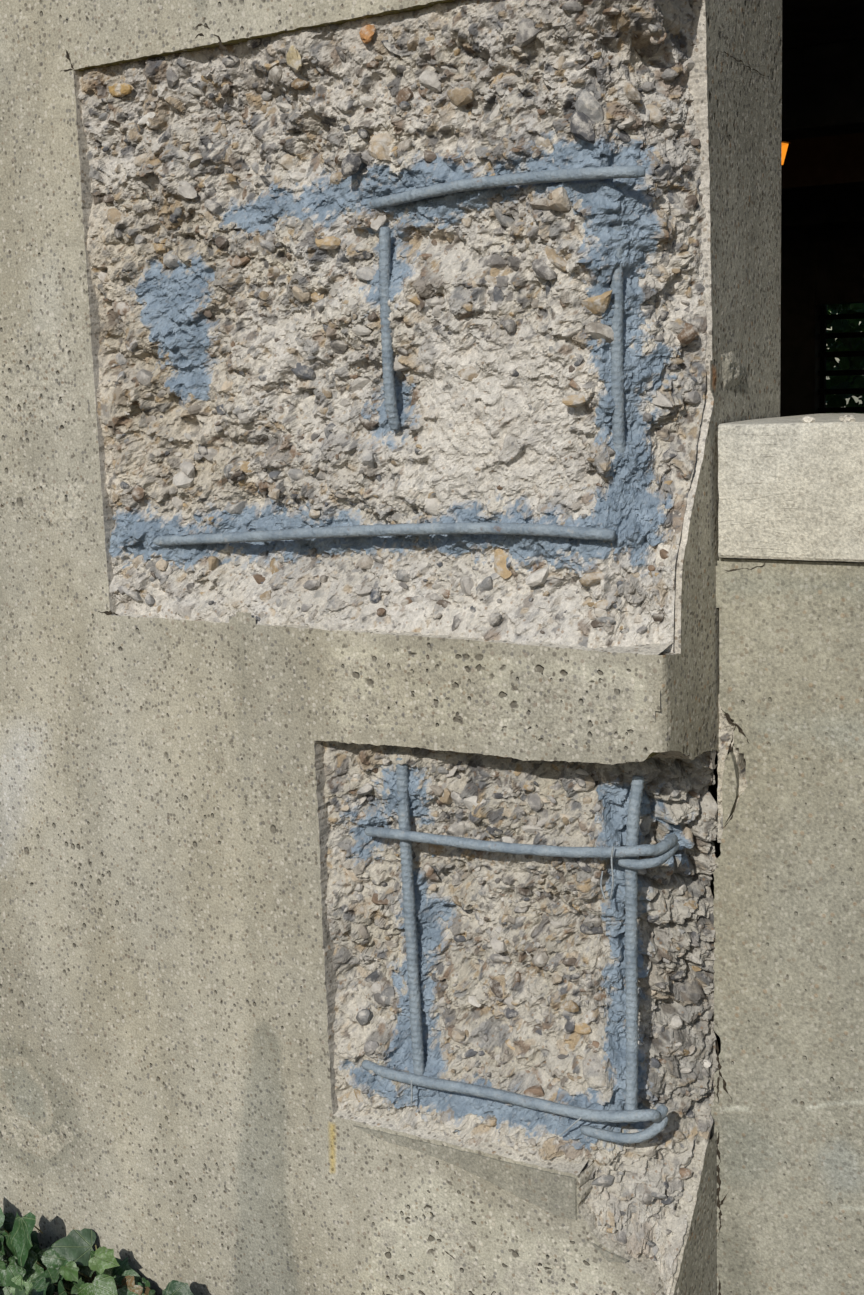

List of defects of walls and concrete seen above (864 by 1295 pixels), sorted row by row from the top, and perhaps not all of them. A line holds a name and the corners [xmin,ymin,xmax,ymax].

spalling [0,0,747,655]
spalling [324,655,636,745]
crack [721,709,749,762]
spalling [314,695,748,1295]
peeling [0,1017,100,1197]
crack [716,1039,732,1236]